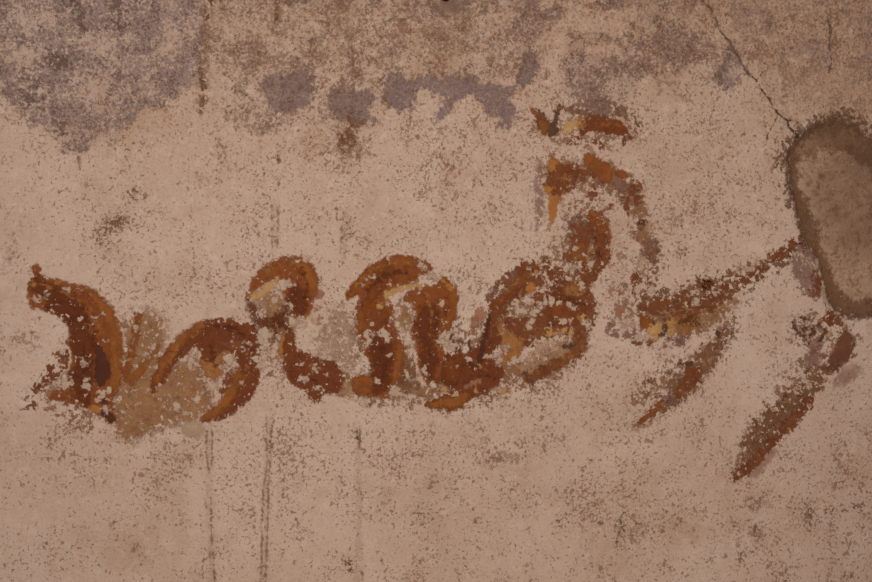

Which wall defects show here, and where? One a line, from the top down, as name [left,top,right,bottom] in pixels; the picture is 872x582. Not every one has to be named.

crack [702,0,799,141]